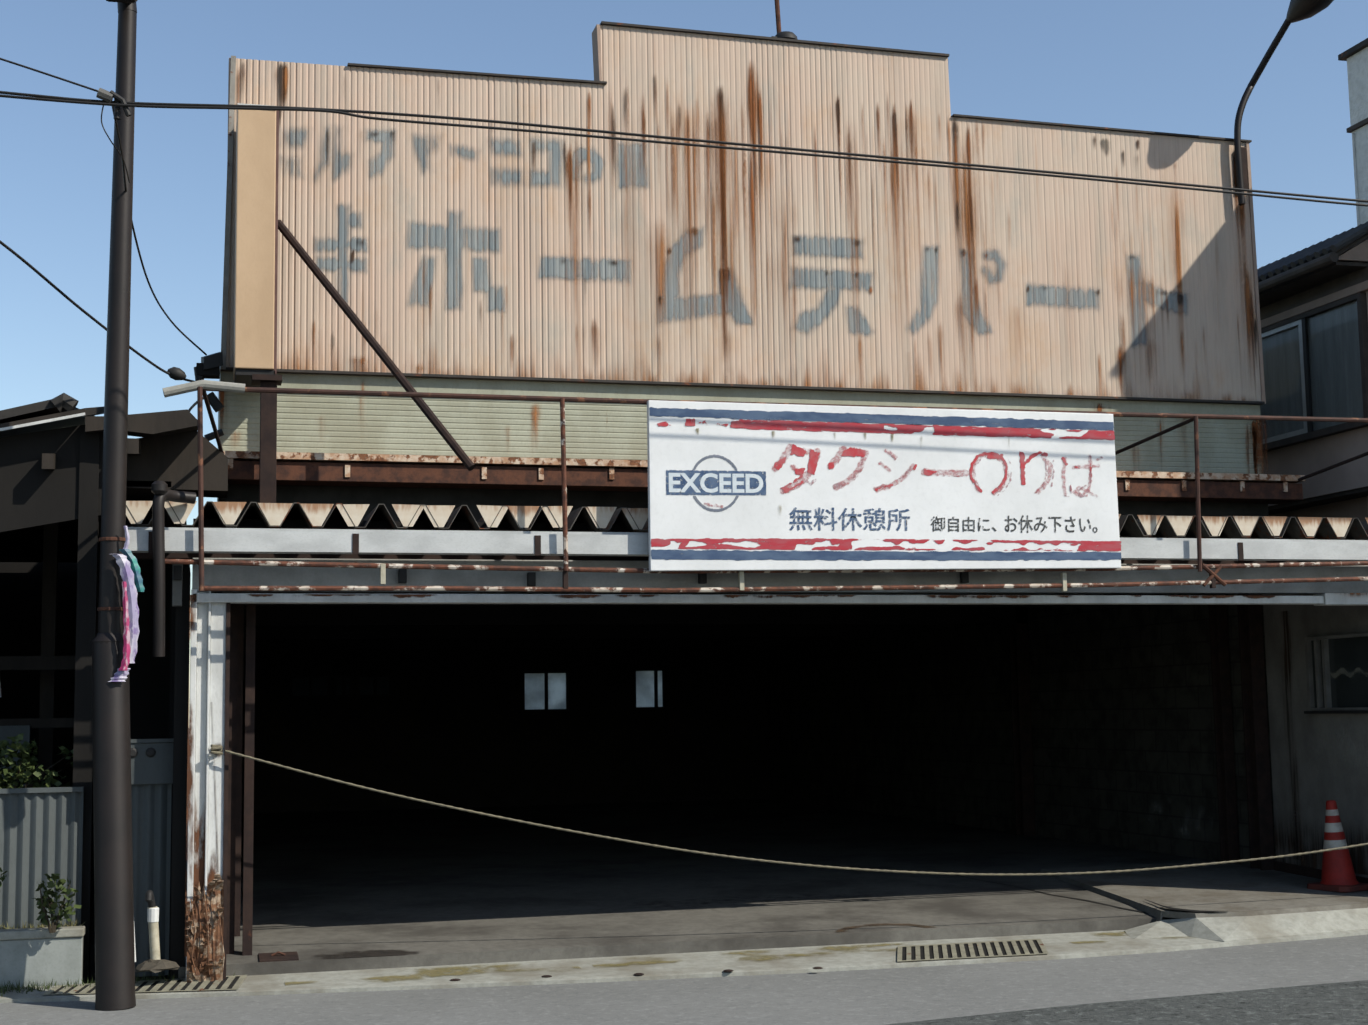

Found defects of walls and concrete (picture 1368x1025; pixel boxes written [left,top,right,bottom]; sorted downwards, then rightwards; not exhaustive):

corrosion [279,64,288,122]
corrosion [564,95,591,200]
corrosion [612,94,645,185]
corrosion [656,233,671,306]
corrosion [667,66,762,318]
corrosion [836,99,851,182]
corrosion [877,103,918,229]
corrosion [948,120,987,316]
corrosion [1119,207,1183,387]
corrosion [184,711,225,983]